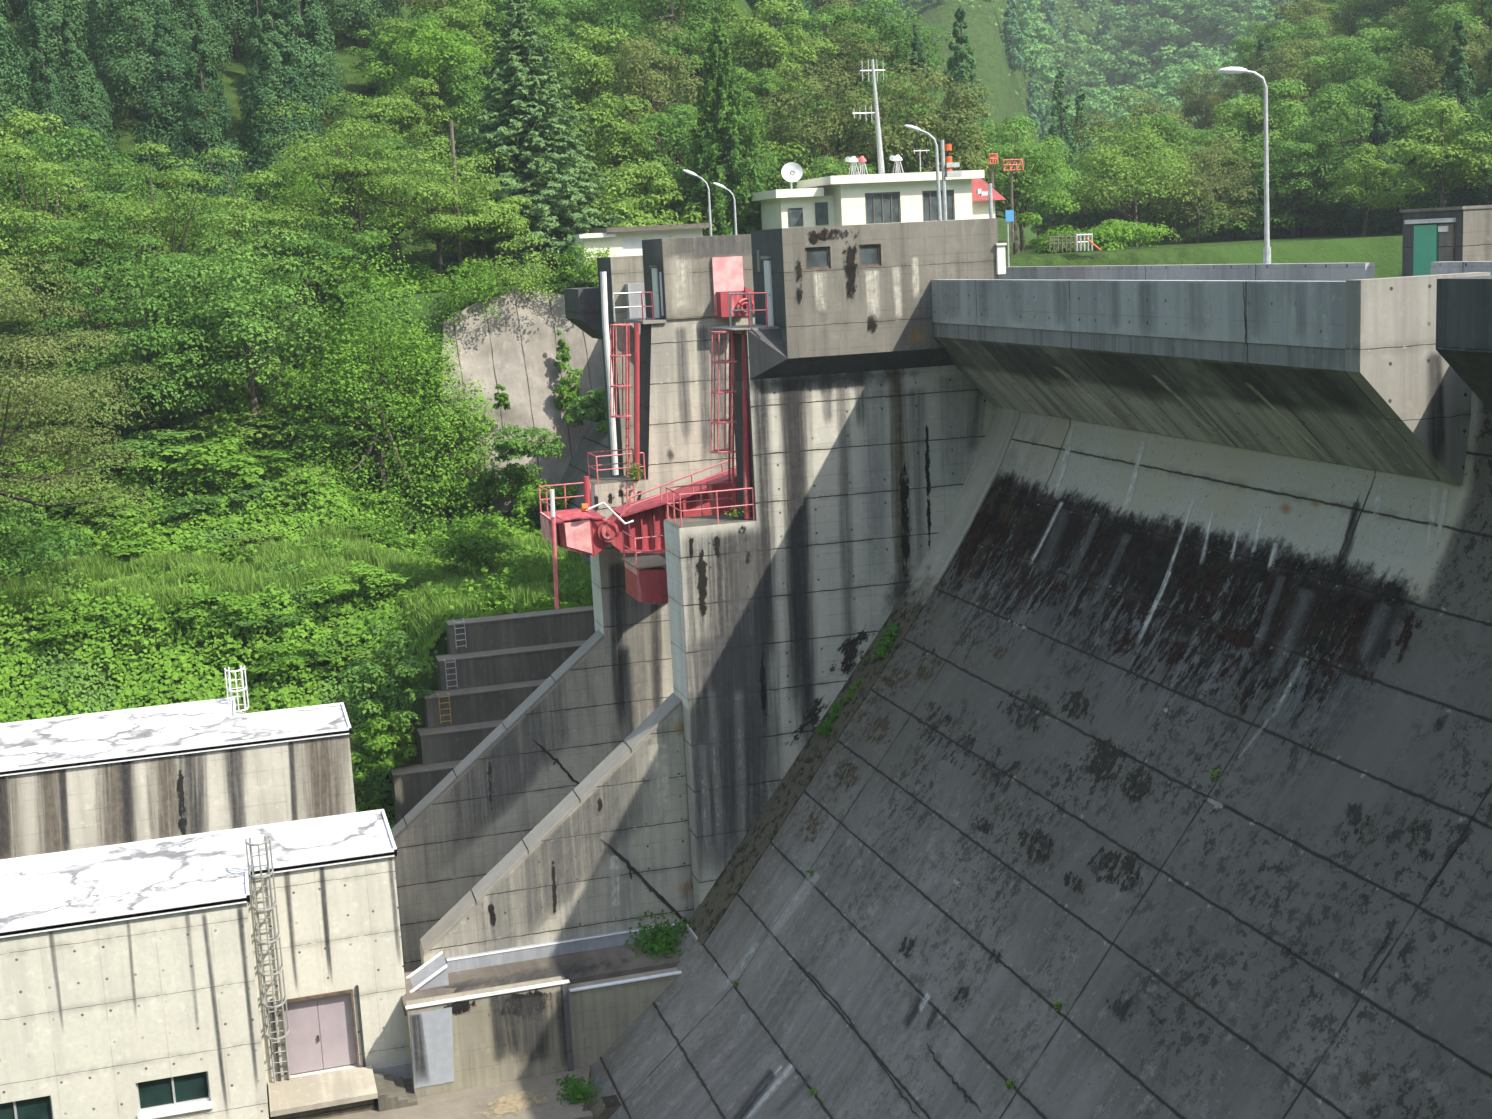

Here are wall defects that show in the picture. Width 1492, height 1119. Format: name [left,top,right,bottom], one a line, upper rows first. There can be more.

water stain [1340,503,1359,561]
water stain [691,369,932,856]
water stain [0,775,16,860]
water stain [38,769,69,853]
water stain [103,761,134,845]
water stain [158,753,204,838]
water stain [226,748,243,829]
water stain [289,737,345,821]
crack [532,739,580,784]
crack [601,839,687,923]
water stain [444,964,597,1062]
crack [927,1043,982,1113]